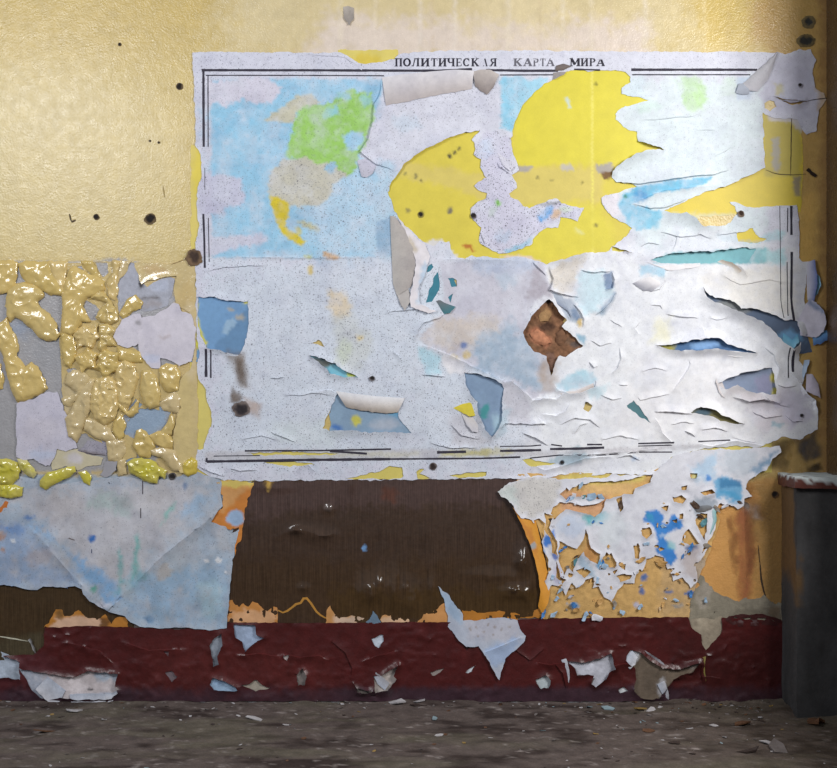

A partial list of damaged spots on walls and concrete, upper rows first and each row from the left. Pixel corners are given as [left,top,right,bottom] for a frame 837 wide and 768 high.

flaking render [118,261,175,312]
spalling [523,299,583,373]
peeling [498,446,782,649]
peeling [210,633,222,667]
peeling [234,624,263,652]
peeling [0,652,118,699]
peeling [210,678,269,691]
peeling [297,669,307,685]
peeling [356,666,398,694]
peeling [536,675,551,689]
peeling [567,654,616,687]
peeling [619,650,700,700]